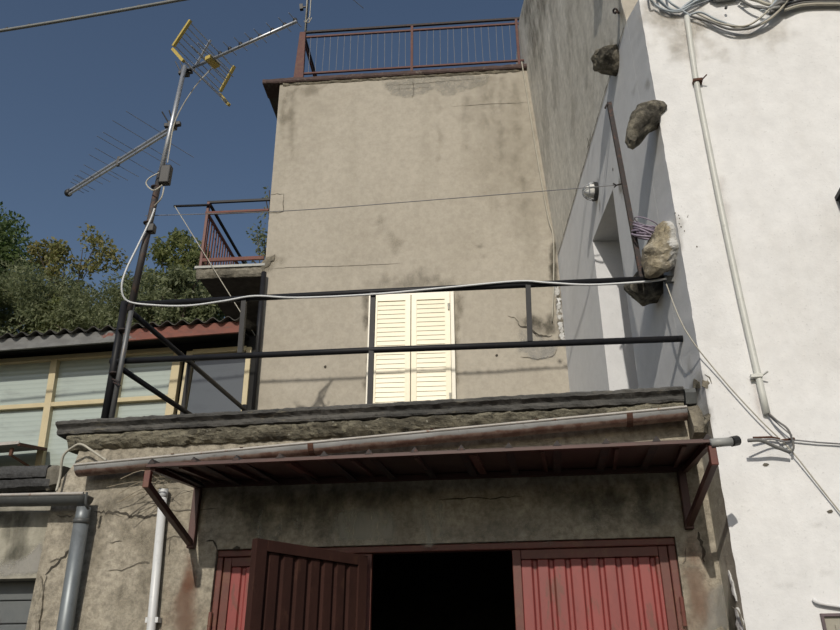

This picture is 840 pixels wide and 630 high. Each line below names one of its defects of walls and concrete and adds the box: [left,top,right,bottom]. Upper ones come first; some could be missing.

crack [509,316,557,360]
crack [94,504,216,519]
crack [683,532,706,563]
crack [43,550,69,590]